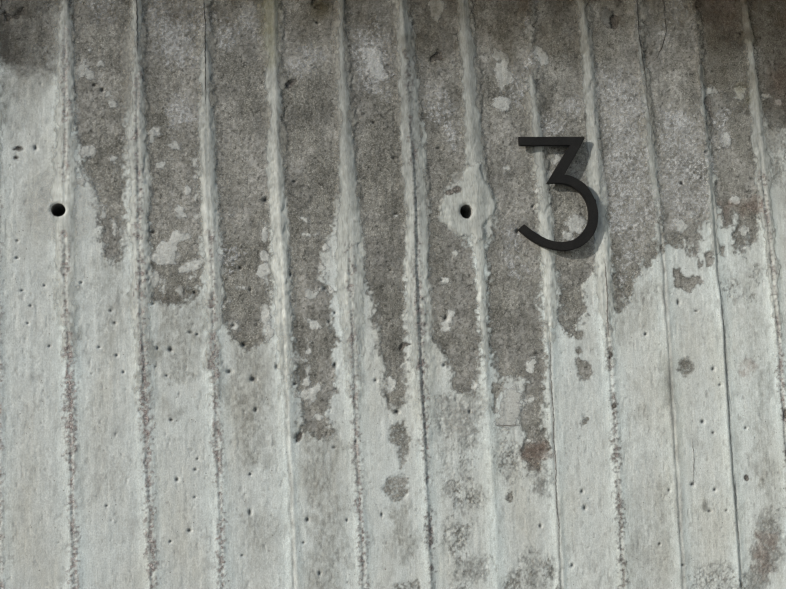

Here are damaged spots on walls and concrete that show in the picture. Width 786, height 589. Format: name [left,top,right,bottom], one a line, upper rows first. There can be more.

crack [636,0,667,93]
damp [604,79,655,231]
damp [658,109,715,226]
crack [549,336,560,558]